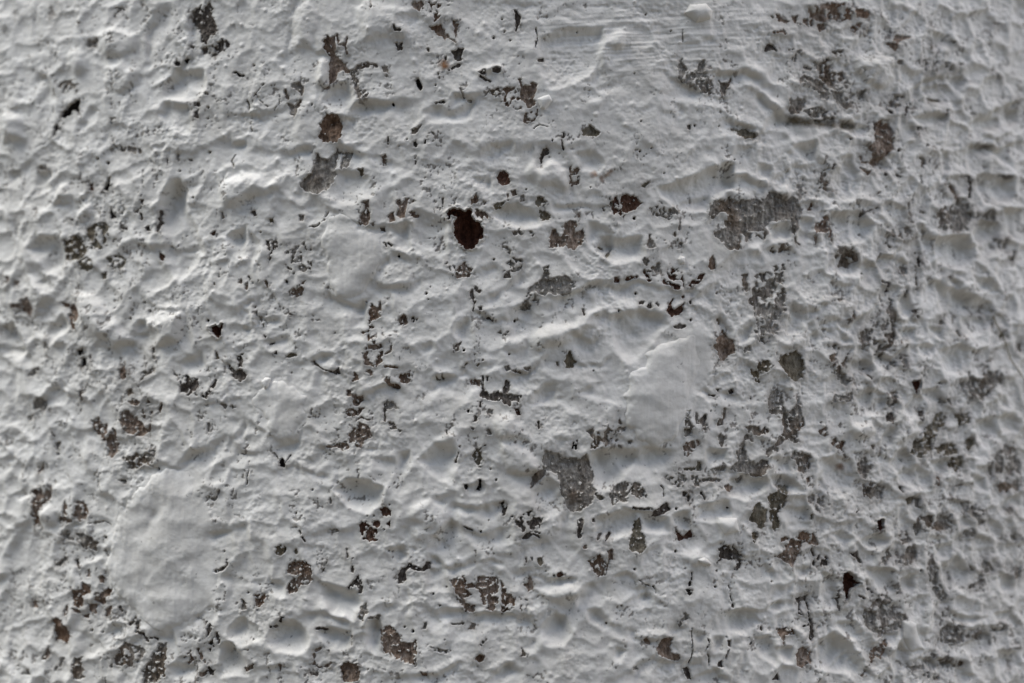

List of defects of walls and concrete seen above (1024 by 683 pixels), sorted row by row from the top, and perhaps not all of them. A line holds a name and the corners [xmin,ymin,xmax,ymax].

peeling [174,3,230,66]
peeling [323,34,389,99]
peeling [764,2,870,123]
peeling [300,114,364,194]
peeling [64,210,128,279]
spalling [442,171,584,250]
peeling [602,182,682,246]
peeling [709,187,812,361]
peeling [666,389,824,520]
peeling [530,419,670,577]
peeling [346,549,431,676]
peeling [451,576,522,630]